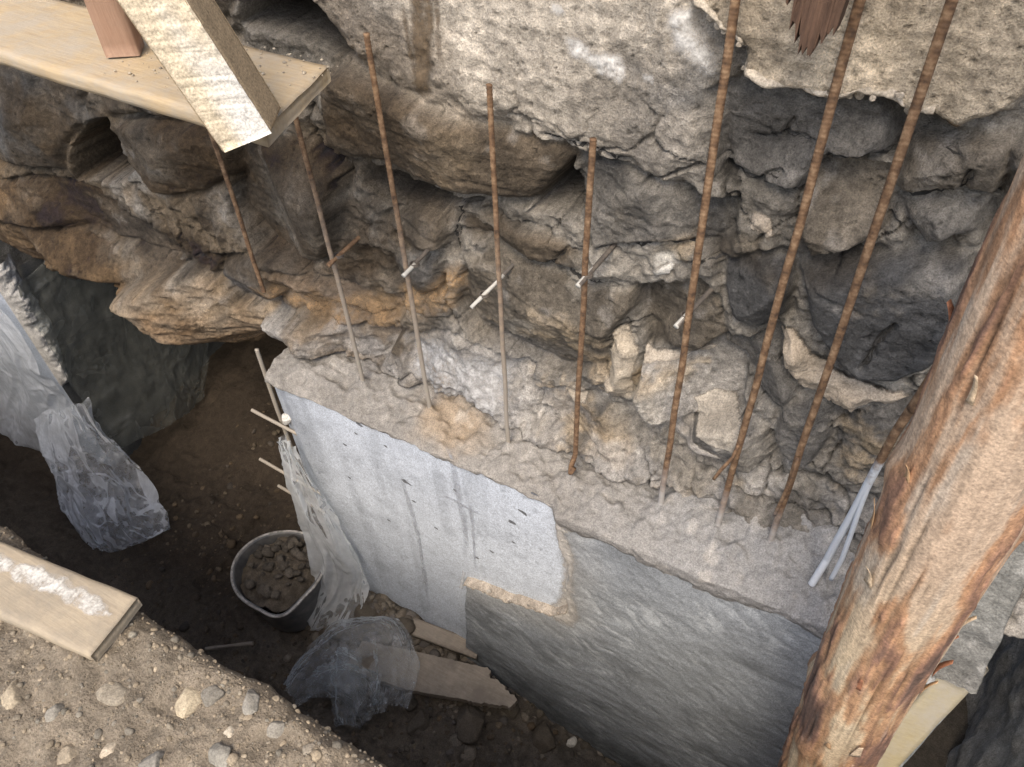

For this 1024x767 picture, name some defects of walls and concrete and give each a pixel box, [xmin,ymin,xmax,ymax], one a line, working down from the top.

spalling [463,522,578,626]